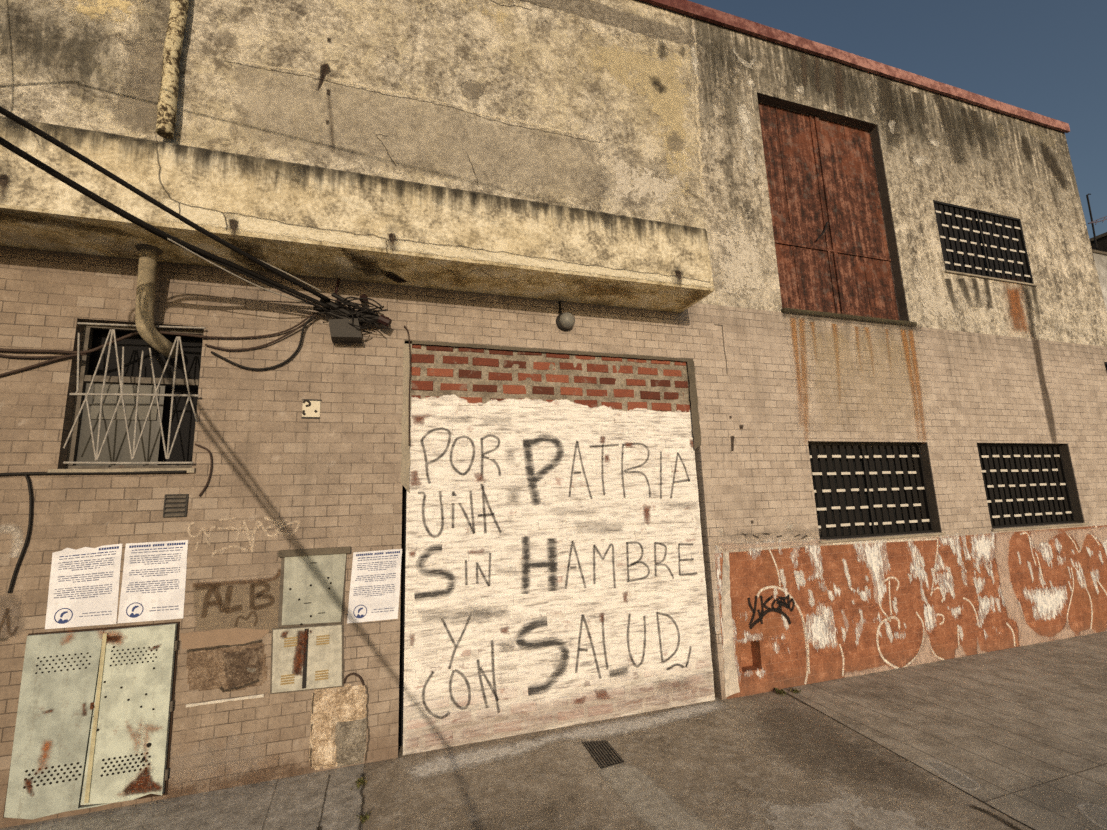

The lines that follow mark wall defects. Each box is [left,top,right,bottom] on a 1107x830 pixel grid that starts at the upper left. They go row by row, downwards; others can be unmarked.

peeling [68,0,132,22]
leakage [1022,136,1065,188]
leakage [512,198,640,224]
rust [1007,288,1027,330]
rust [791,318,815,384]
rust [901,331,921,398]
rust [101,633,122,648]
flaking render [309,684,370,770]
rust [122,743,162,795]